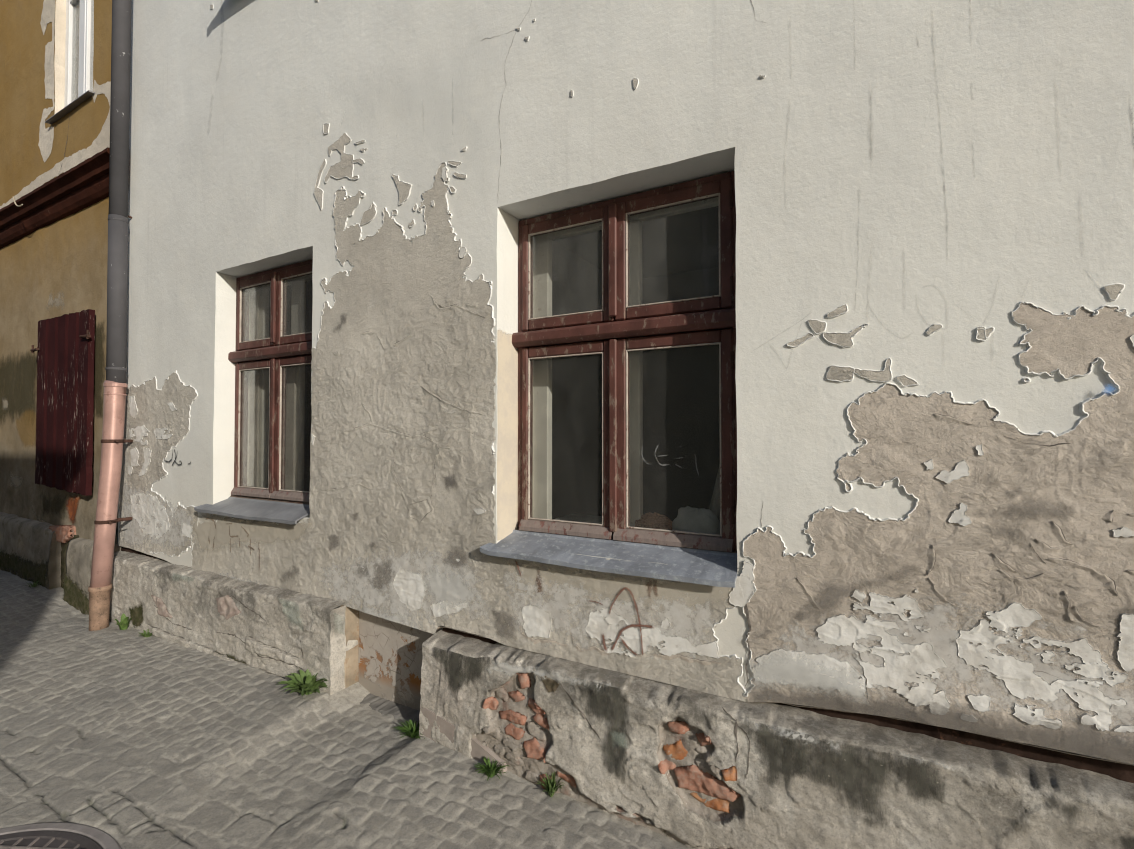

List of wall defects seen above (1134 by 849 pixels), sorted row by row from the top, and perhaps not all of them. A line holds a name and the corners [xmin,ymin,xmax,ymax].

peeling [0,0,111,209]
water stain [0,353,37,422]
peeling [118,123,1134,763]
water stain [434,647,627,779]
spalling [472,672,743,849]
water stain [748,723,945,825]
water stain [755,605,1134,765]